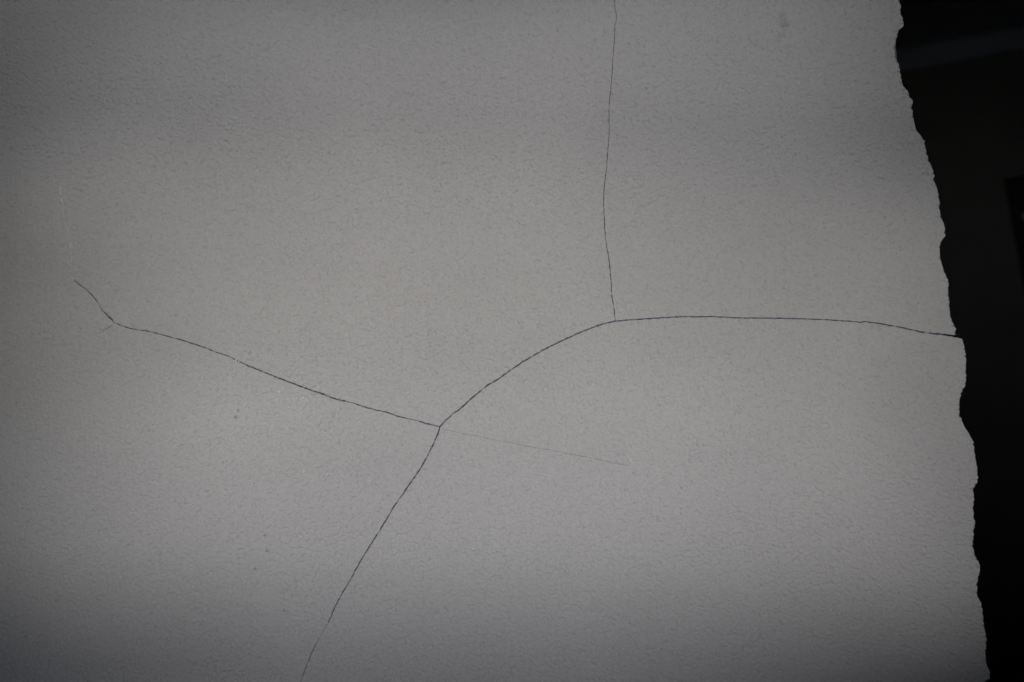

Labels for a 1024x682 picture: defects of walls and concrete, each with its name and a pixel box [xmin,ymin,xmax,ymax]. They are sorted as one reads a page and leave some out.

crack [609,0,617,106]
crack [52,123,962,678]